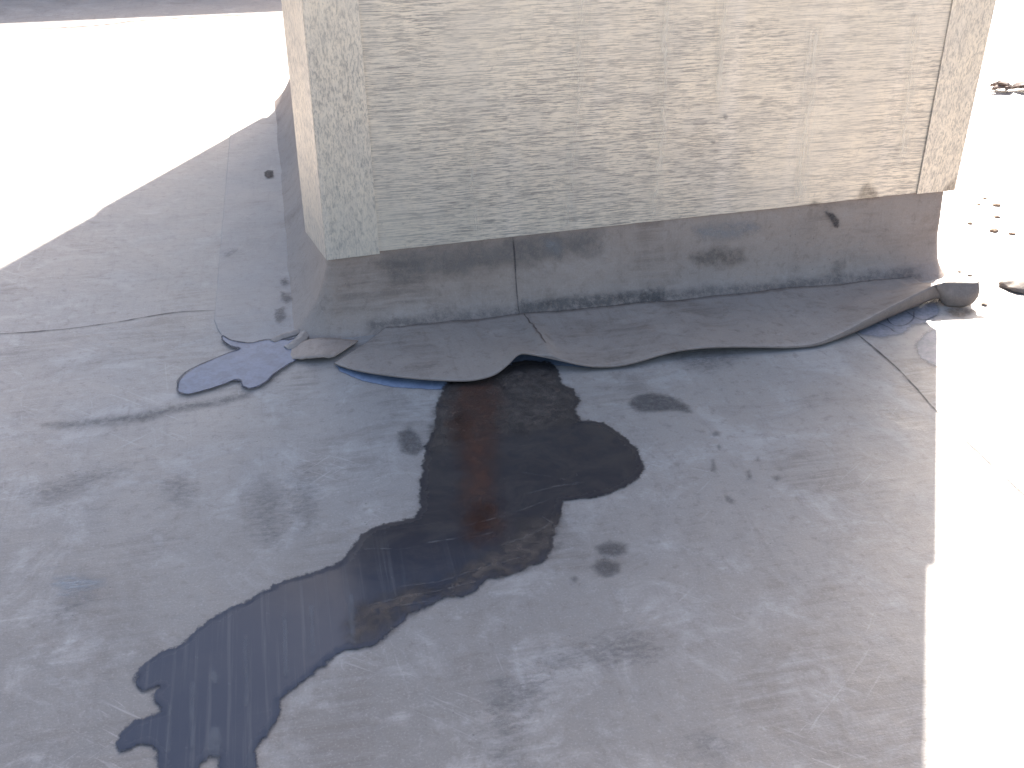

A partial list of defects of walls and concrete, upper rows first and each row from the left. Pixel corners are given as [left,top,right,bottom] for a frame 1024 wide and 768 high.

crack [513,241,545,342]
peeling [177,335,296,394]
leakage [632,394,687,410]
leakage [116,360,644,768]